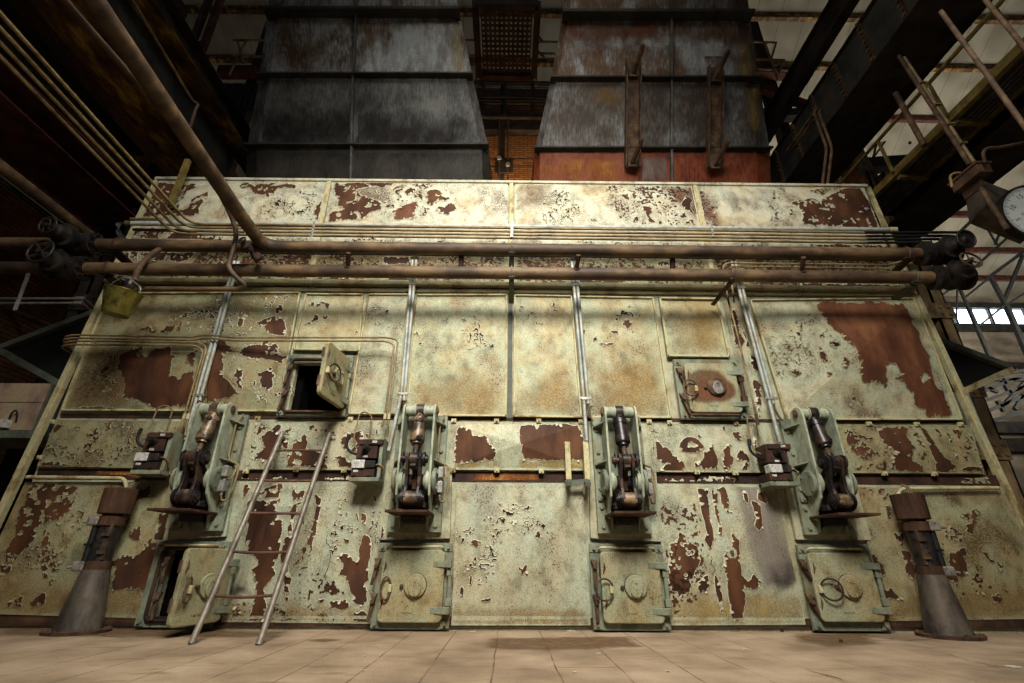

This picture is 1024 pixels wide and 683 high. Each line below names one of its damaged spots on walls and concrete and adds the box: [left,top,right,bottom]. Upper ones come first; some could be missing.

peeling [132,181,223,240]
peeling [313,182,457,222]
peeling [790,188,878,227]
peeling [79,304,287,409]
corrosion [689,370,734,402]
peeling [816,300,989,484]
peeling [251,424,379,480]
peeling [453,426,497,464]
peeling [517,423,584,462]
peeling [0,483,79,577]
peeling [243,477,322,622]
peeling [652,426,761,622]